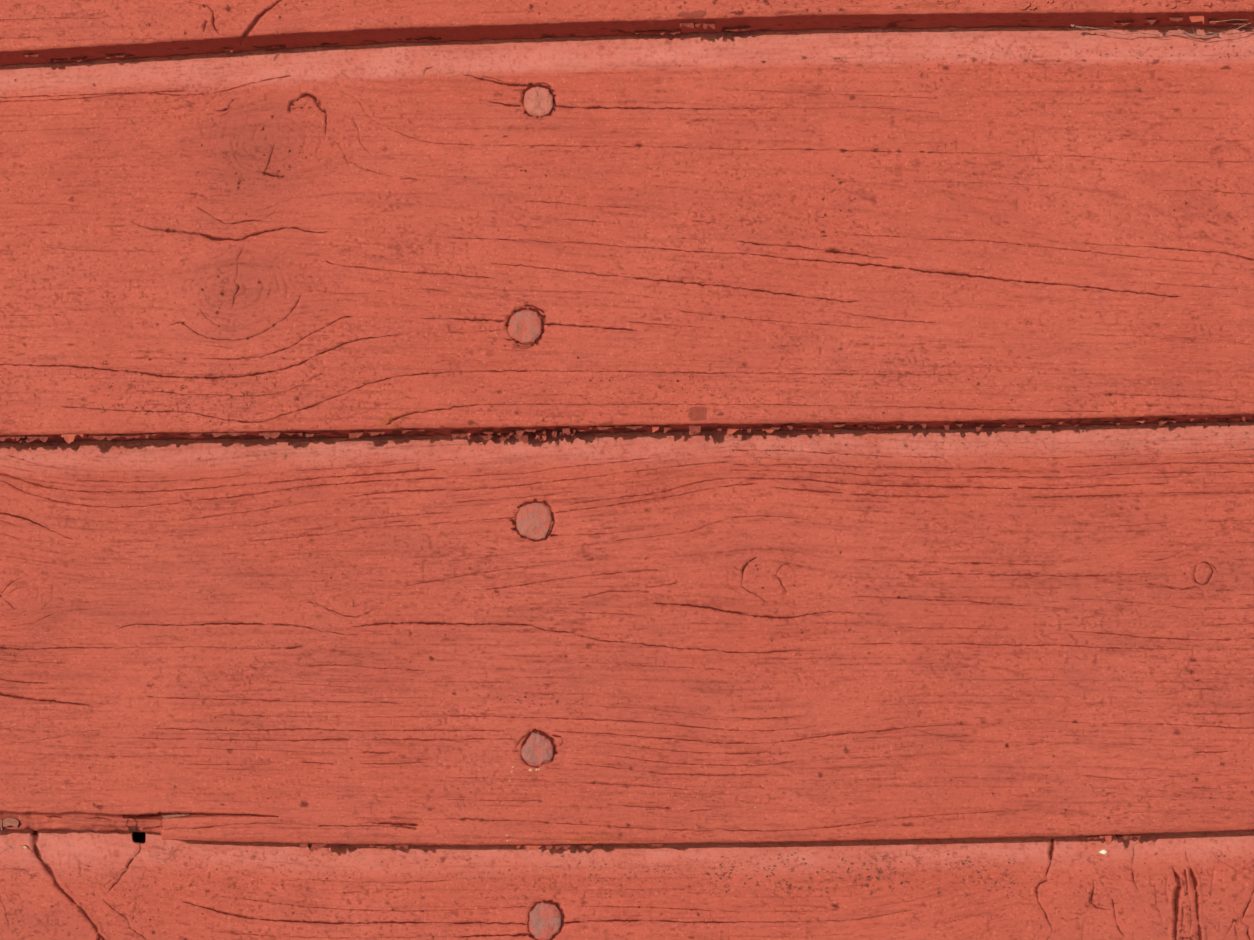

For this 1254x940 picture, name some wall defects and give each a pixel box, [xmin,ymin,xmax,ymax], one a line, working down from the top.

crack [202,0,281,45]
crack [25,813,279,940]
crack [1036,839,1054,919]
crack [1173,868,1201,940]